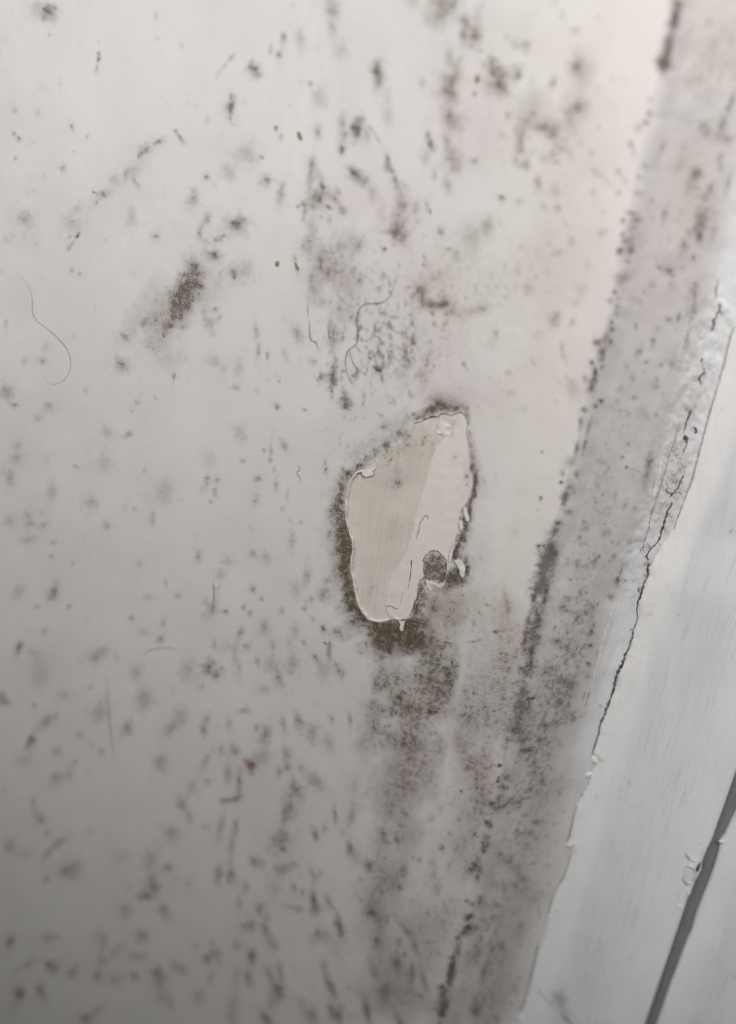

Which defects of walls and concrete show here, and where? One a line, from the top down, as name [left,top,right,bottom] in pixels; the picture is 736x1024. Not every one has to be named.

water stain [657,0,683,73]
water stain [340,118,365,155]
water stain [382,156,418,251]
water stain [144,262,204,351]
water stain [318,365,351,409]
peeling [328,398,479,658]
crack [583,280,735,753]
water stain [361,276,624,1024]